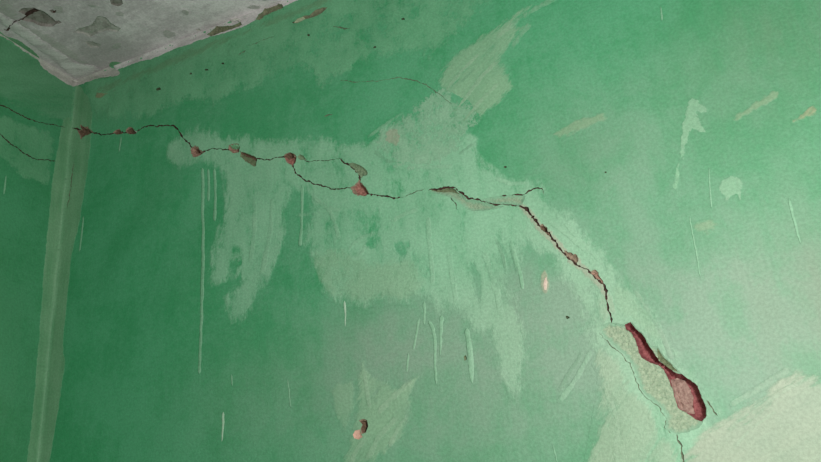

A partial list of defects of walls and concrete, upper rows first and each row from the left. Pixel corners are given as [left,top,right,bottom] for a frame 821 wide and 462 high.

crack [0,105,229,152]
crack [0,134,74,207]
spalling [349,163,369,196]
crack [257,156,684,462]
spalling [601,322,707,435]
spalling [353,419,368,439]